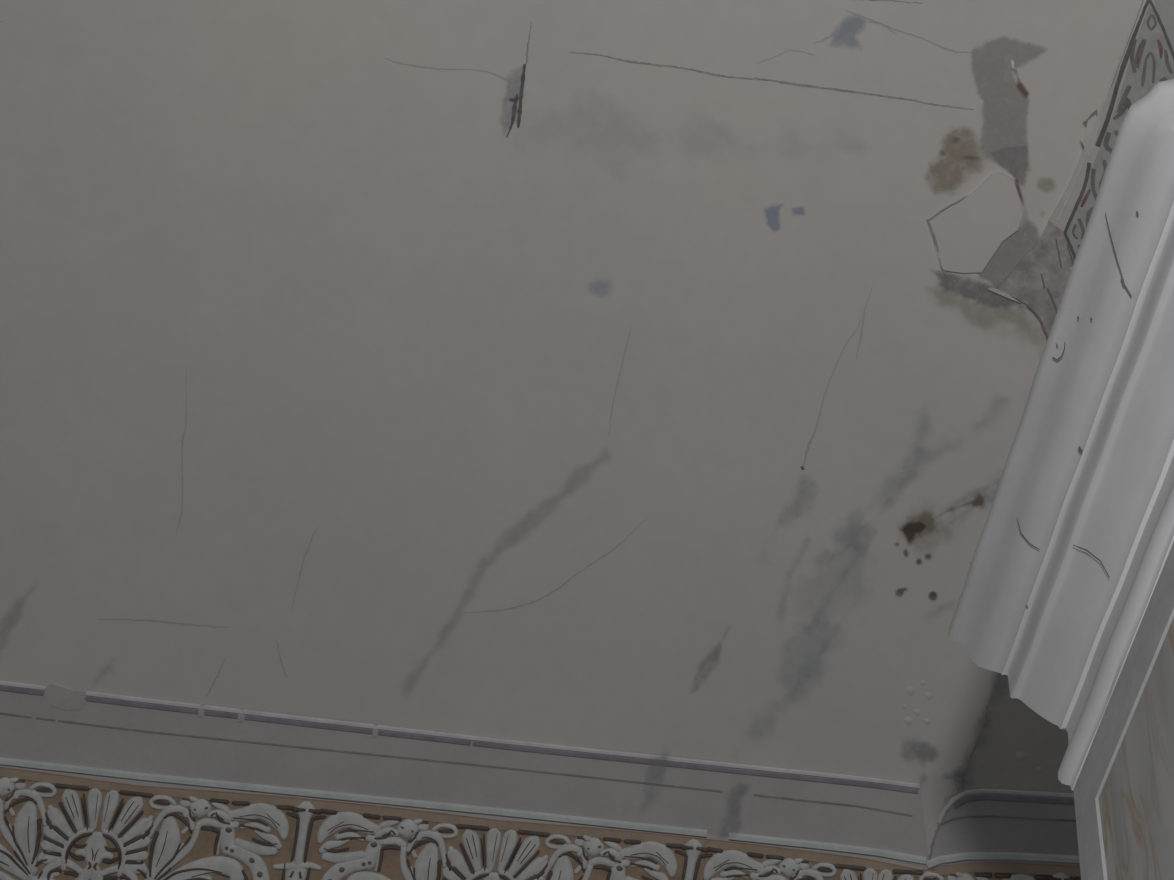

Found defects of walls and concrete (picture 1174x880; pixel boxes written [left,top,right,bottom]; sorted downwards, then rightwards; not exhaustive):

crack [384,22,532,137]
crack [570,0,974,110]
peeling [926,39,1043,306]
crack [800,288,872,470]
damp [903,517,932,564]